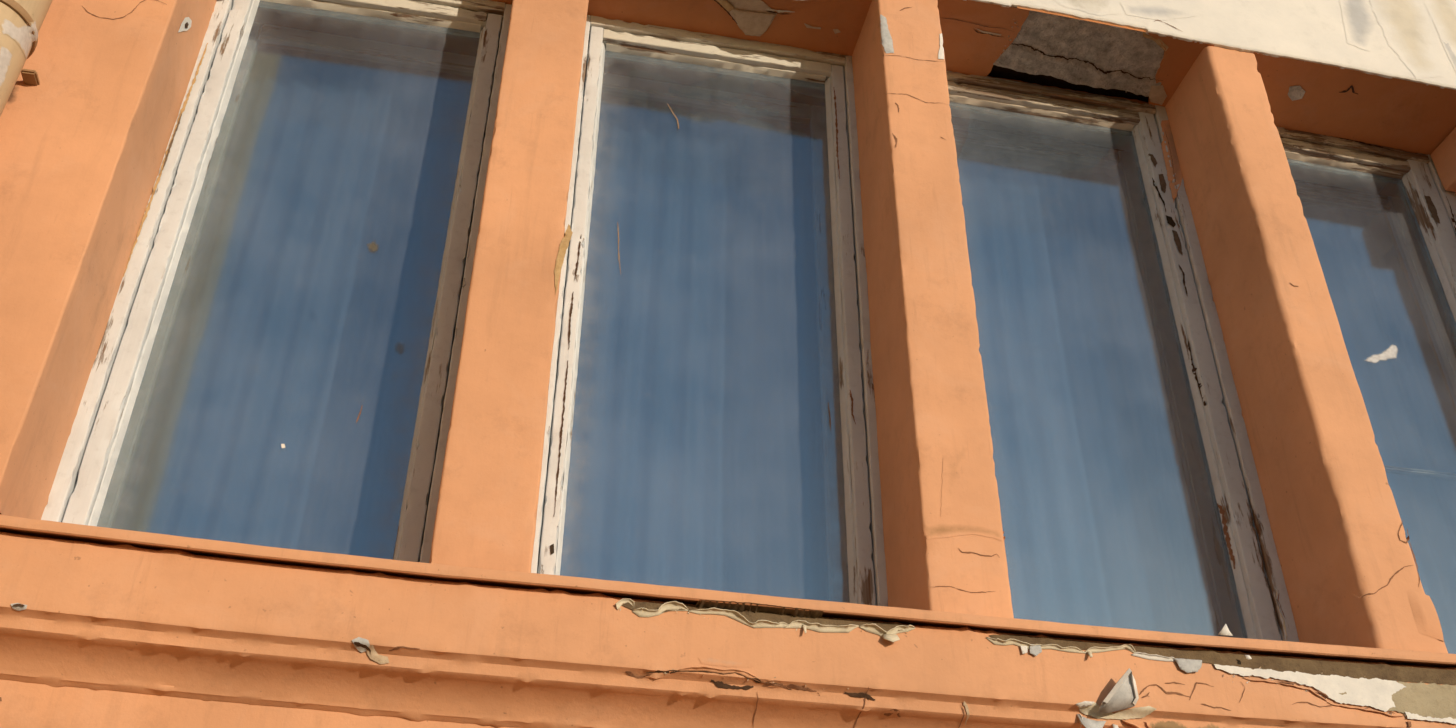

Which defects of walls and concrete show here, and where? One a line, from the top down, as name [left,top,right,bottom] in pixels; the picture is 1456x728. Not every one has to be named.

peeling [714,0,840,36]
peeling [880,7,945,62]
spalling [987,11,1169,105]
peeling [1424,195,1456,230]
crack [1358,521,1420,598]
peeling [616,599,915,642]
crack [1276,590,1287,640]
crack [625,656,901,728]
flaking render [986,624,1456,728]